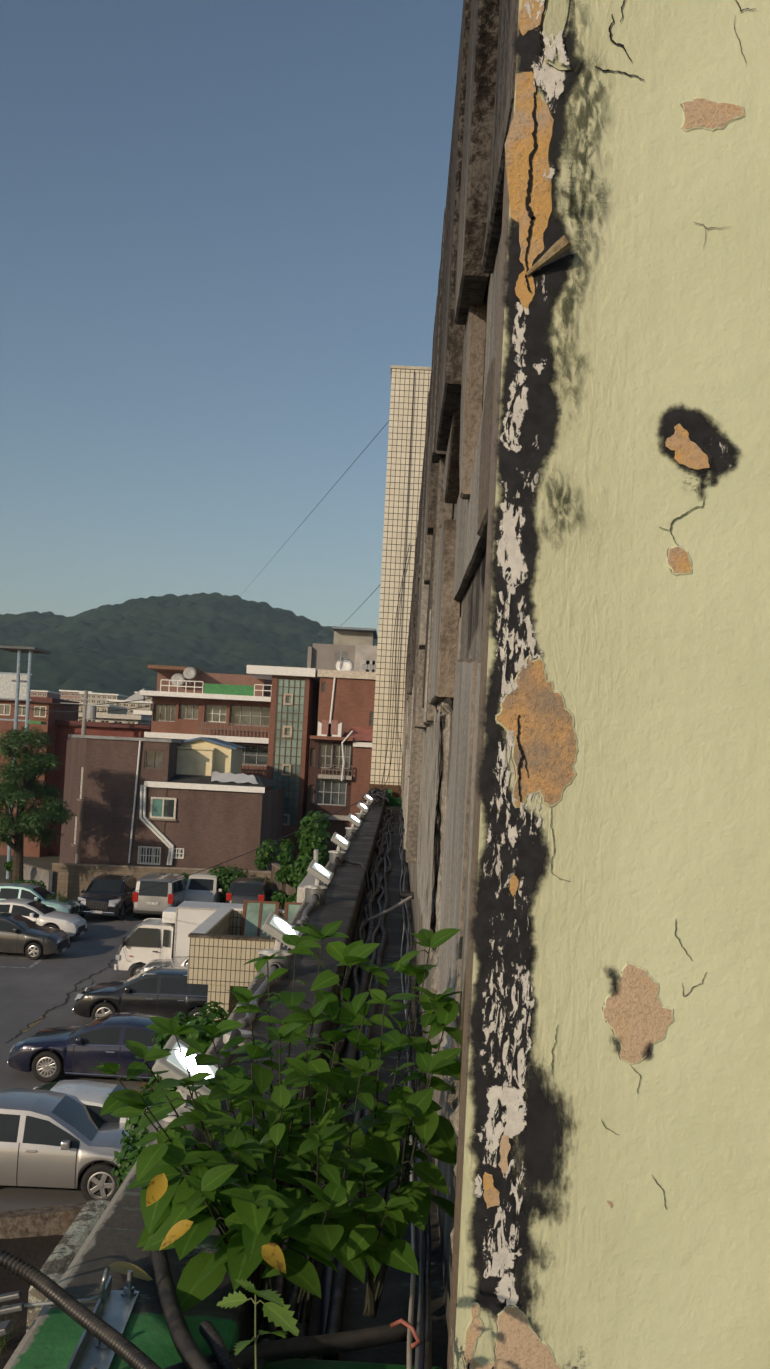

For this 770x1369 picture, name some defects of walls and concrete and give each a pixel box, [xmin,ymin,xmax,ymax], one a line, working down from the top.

crack [595,0,644,80]
crack [734,0,753,61]
flaking render [680,97,745,132]
water stain [658,405,740,496]
flaking render [666,544,693,576]
crack [660,497,705,546]
flaking render [443,0,579,1369]
water stain [467,4,606,1337]
spalling [438,1031,456,1059]
flaking render [602,962,675,1065]